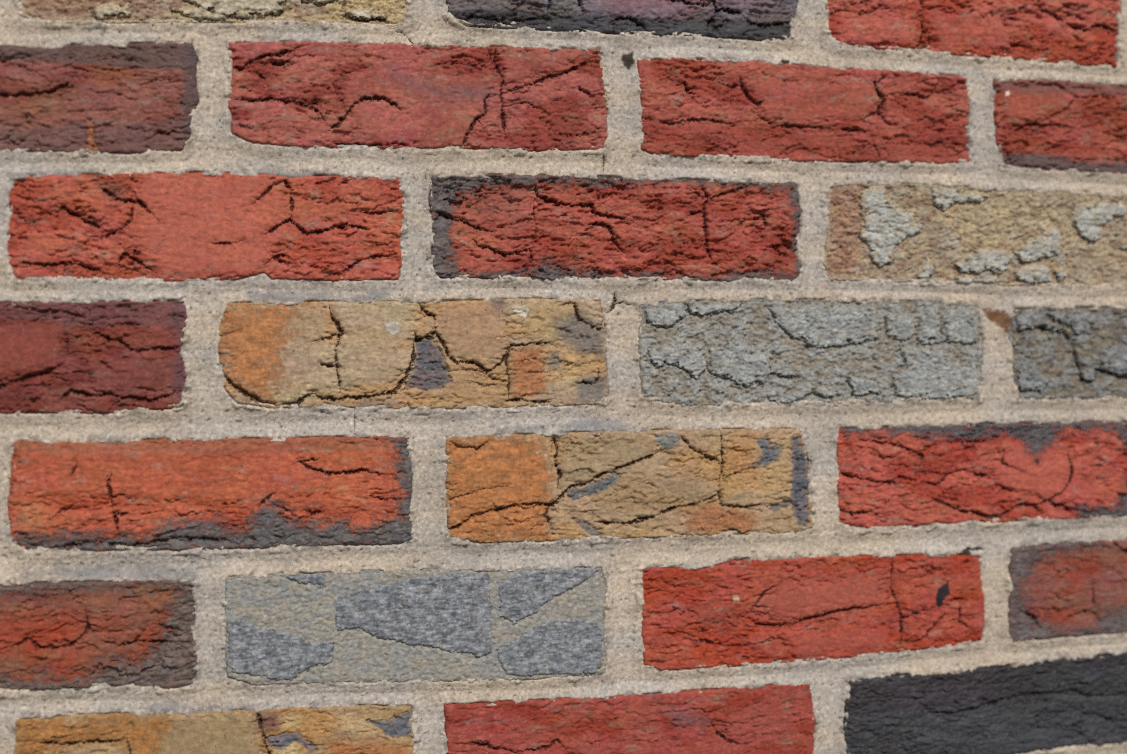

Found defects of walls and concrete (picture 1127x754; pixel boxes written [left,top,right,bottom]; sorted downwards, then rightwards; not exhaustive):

spalling [22,0,406,25]
crack [233,49,409,148]
crack [462,0,606,171]
crack [19,187,160,275]
crack [211,180,395,276]
crack [436,186,635,263]
spalling [825,184,1127,286]
crack [226,304,552,434]
spalling [640,301,982,405]
spalling [1011,308,1127,398]
crack [447,431,766,534]
crack [840,439,1074,528]